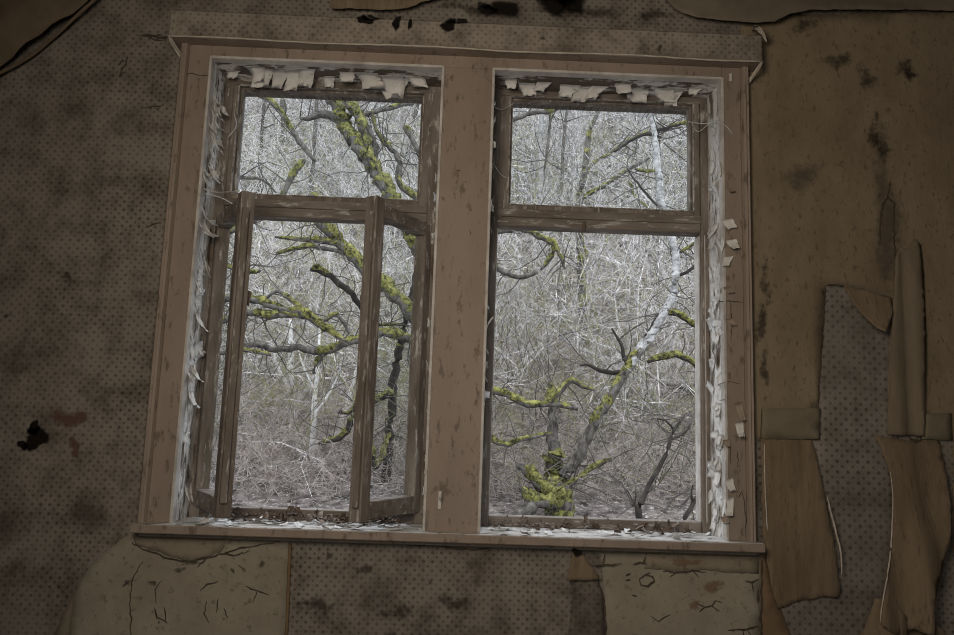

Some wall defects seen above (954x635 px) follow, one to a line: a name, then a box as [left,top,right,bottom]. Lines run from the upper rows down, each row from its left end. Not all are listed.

peeling [203,66,428,193]
peeling [505,79,701,106]
peeling [199,207,219,238]
peeling [672,11,954,538]
peeling [187,260,211,409]
peeling [177,516,362,529]
peeling [491,525,570,536]
flaking render [69,534,289,635]
crack [126,541,280,635]
crack [590,553,701,635]
flaking render [601,541,790,635]
crack [695,560,763,635]